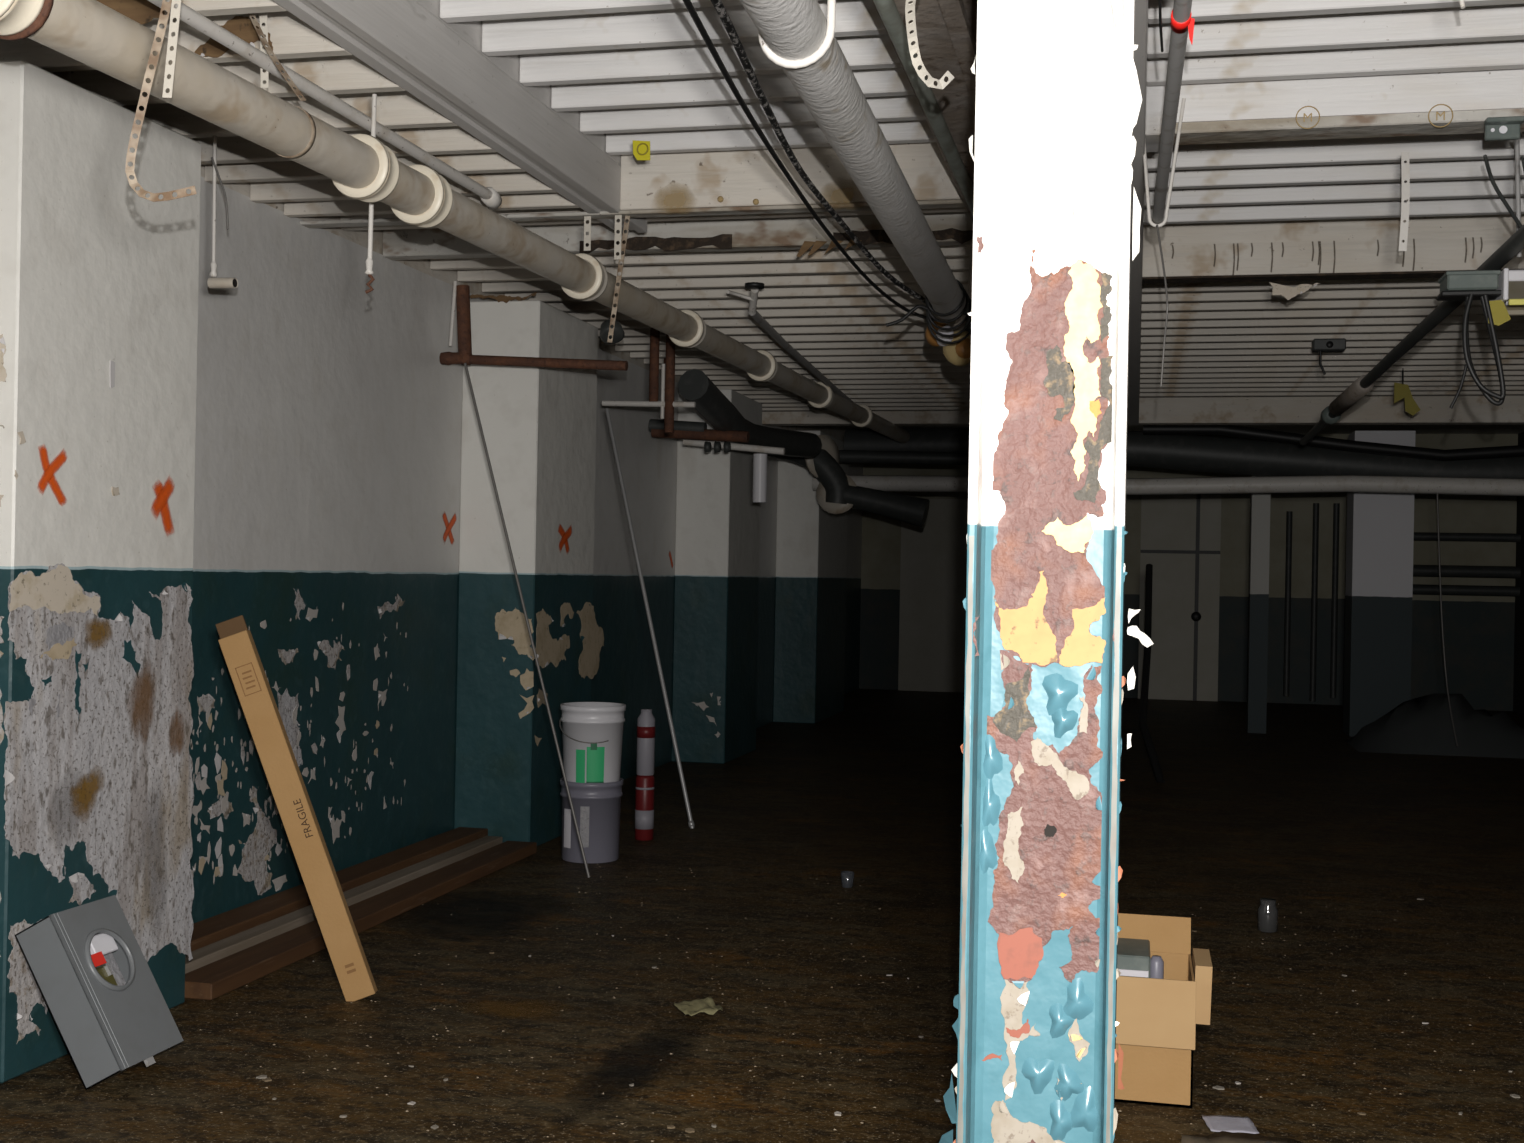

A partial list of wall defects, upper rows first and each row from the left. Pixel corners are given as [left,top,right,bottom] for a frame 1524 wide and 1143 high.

corrosion [648,419,750,443]
peeling [0,563,288,962]
peeling [265,589,408,844]
peeling [495,602,604,719]
peeling [939,248,1154,1143]
peeling [0,919,48,1043]